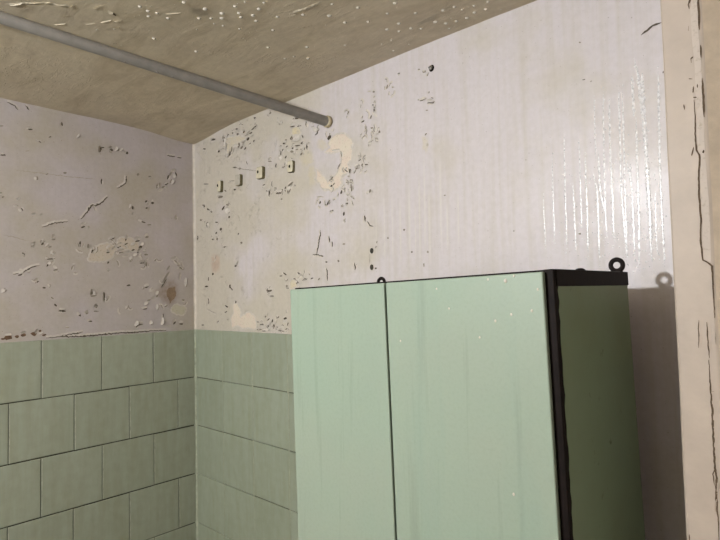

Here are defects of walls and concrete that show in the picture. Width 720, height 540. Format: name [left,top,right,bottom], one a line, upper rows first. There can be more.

peeling [262,89,380,223]
water stain [543,59,667,277]
peeling [75,204,188,328]
peeling [224,301,290,334]
crack [683,0,720,537]